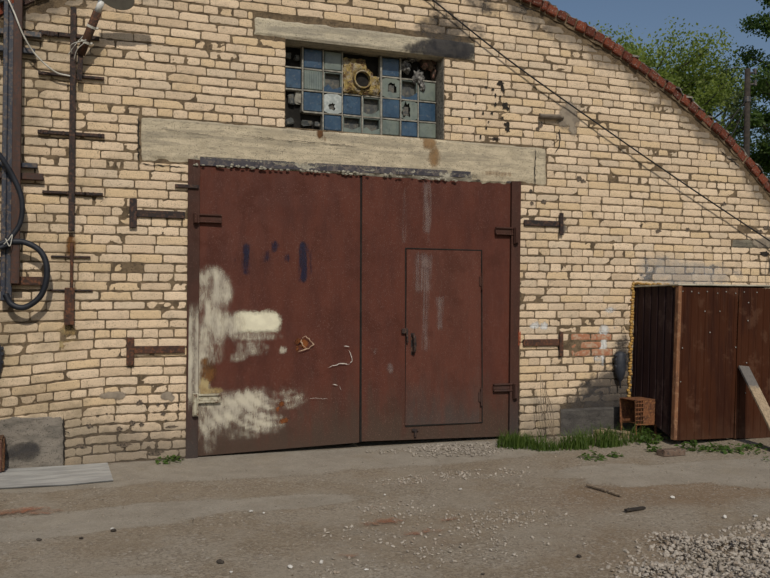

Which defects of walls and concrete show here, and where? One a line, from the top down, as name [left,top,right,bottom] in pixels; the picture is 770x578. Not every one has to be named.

rust [420,138,438,165]
rust [67,234,75,256]
rust [199,358,222,394]